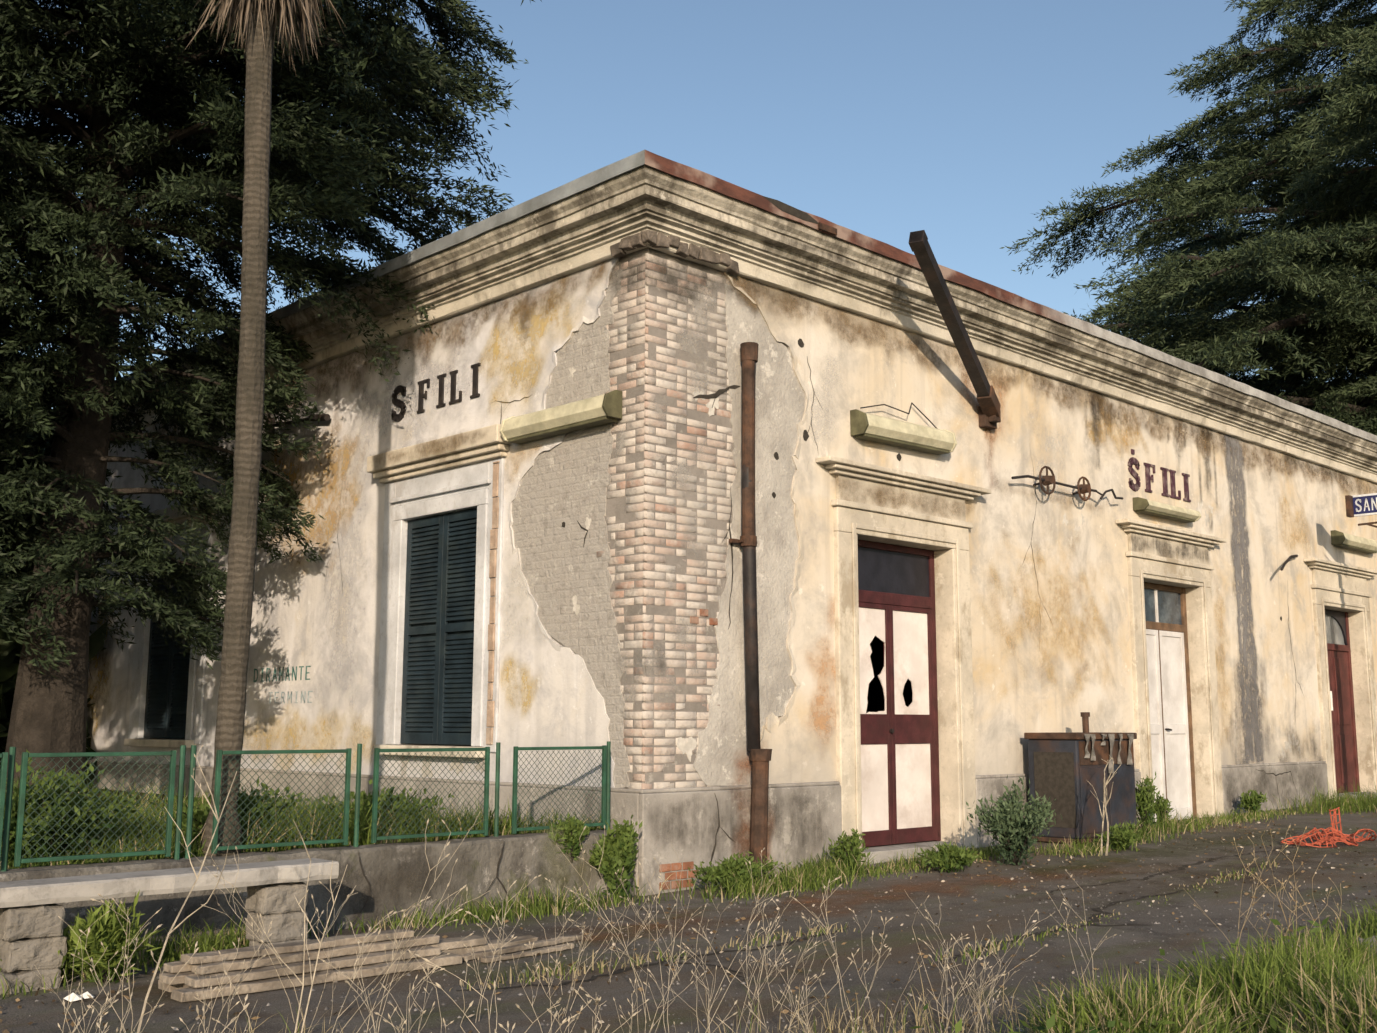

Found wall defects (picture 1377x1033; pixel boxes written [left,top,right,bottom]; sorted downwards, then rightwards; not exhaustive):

damp [286,321,465,407]
damp [486,276,566,385]
damp [826,311,956,364]
flaking render [450,230,809,789]
damp [1089,392,1367,764]
crack [711,795,736,867]